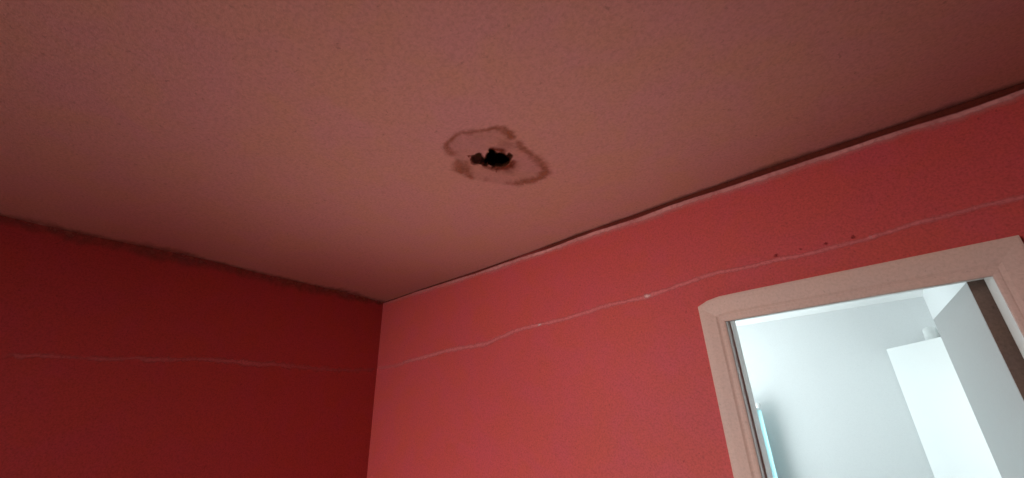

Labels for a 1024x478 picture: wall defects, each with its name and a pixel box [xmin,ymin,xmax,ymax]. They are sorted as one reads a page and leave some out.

spalling [471,148,511,167]
crack [402,195,1024,364]
crack [13,354,345,371]